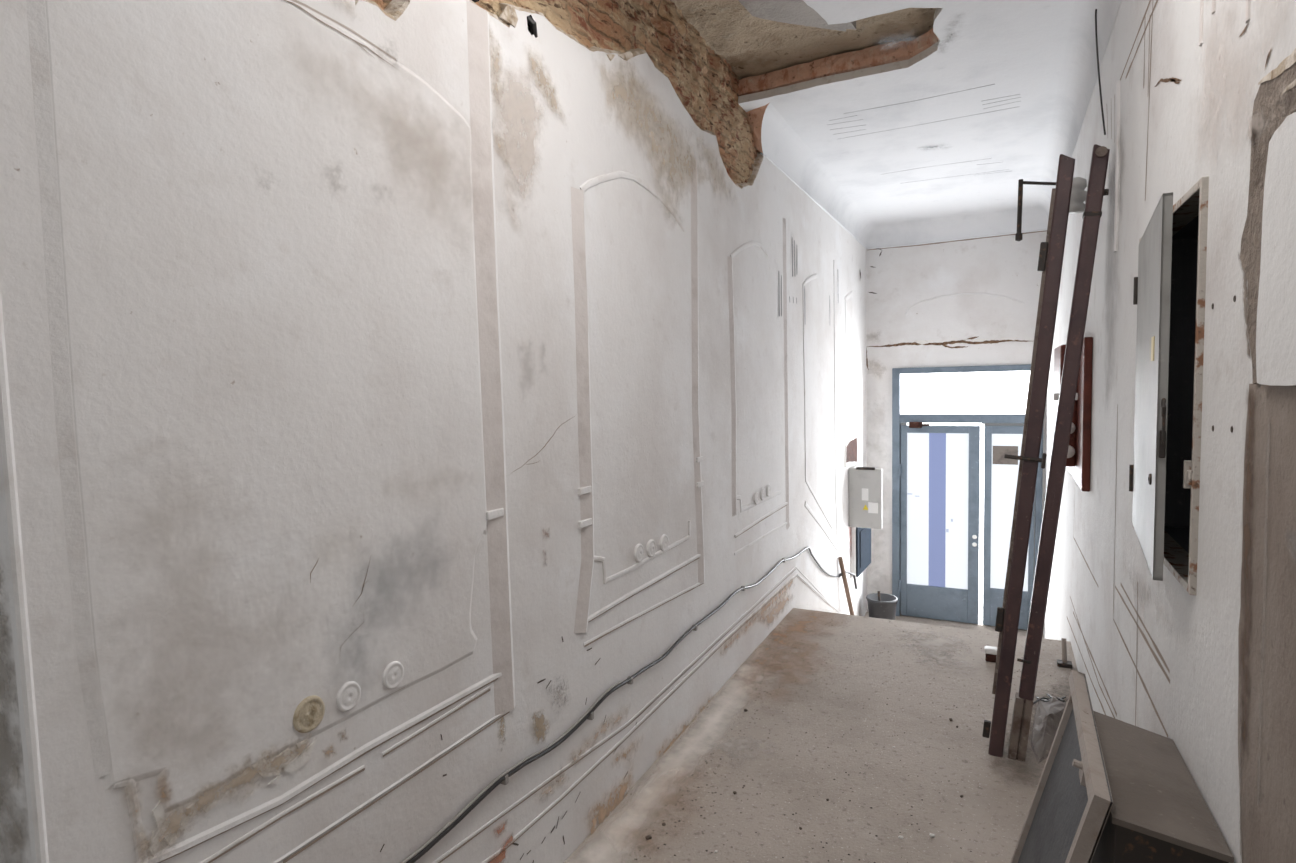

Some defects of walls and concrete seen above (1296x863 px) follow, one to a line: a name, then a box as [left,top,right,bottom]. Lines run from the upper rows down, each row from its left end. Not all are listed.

flaking render [355,0,410,21]
flaking render [469,0,763,189]
crack [866,337,1028,370]
crack [512,415,576,473]